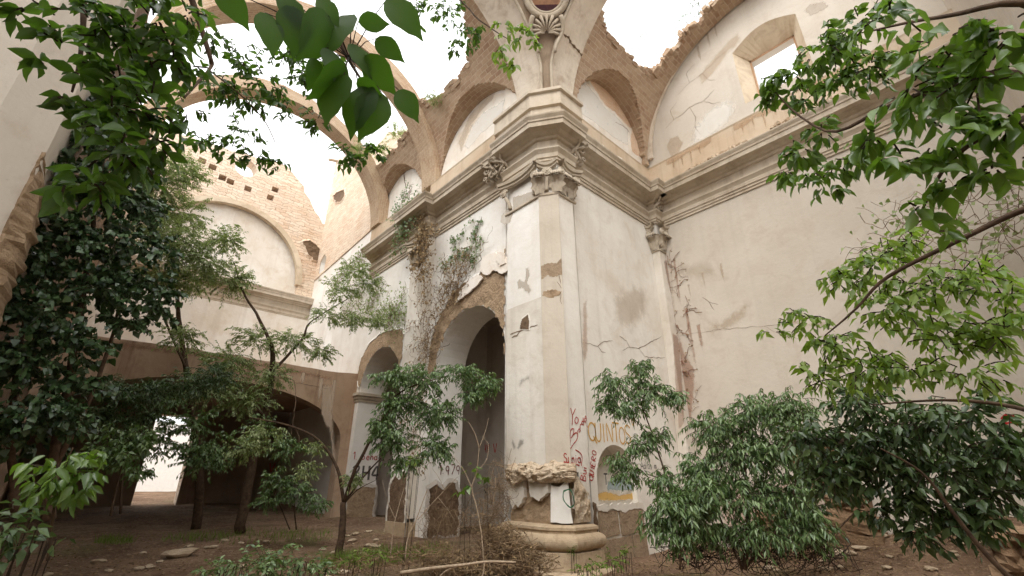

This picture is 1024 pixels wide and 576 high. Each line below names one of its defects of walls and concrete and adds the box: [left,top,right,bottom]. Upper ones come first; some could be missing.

crack [667,46,732,131]
spalling [426,249,508,378]
spalling [519,313,531,331]
spalling [518,259,562,298]
crack [587,336,665,358]
spalling [505,460,649,562]